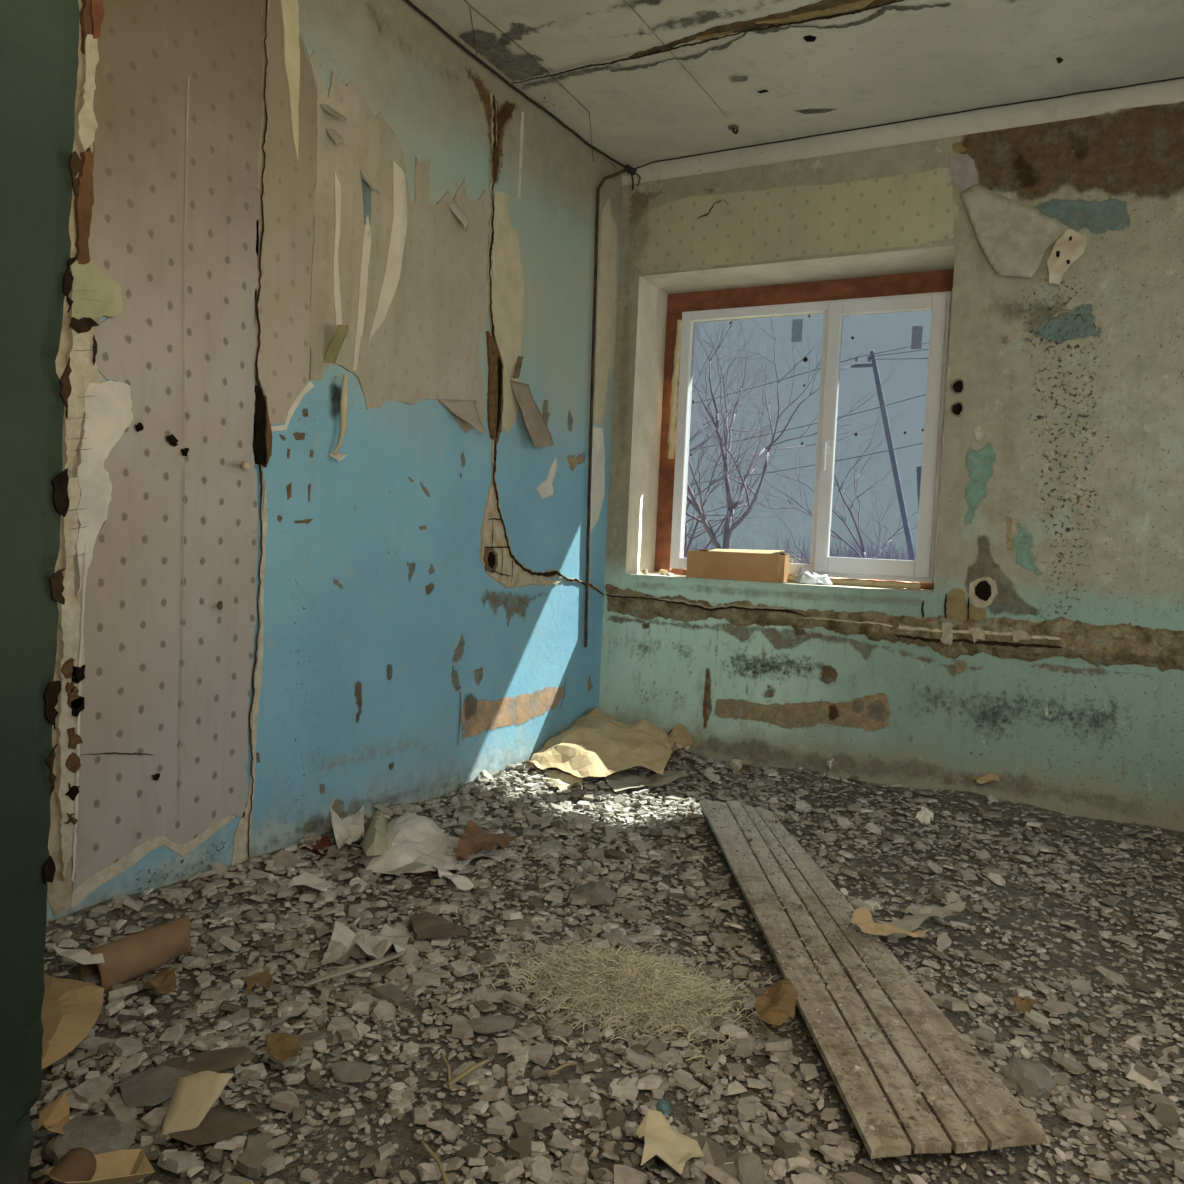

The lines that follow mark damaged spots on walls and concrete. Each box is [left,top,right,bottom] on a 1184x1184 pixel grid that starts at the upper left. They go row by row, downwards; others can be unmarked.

peeling [280,0,300,162]
damp [459,23,619,108]
spalling [949,142,978,191]
peeling [1035,198,1130,234]
crack [486,0,951,596]
peeling [1023,304,1101,347]
spalling [42,0,133,916]
peeling [279,432,314,458]
spalling [944,577,998,620]
peeling [450,632,566,745]
peeling [715,685,892,732]
peeling [818,664,839,687]